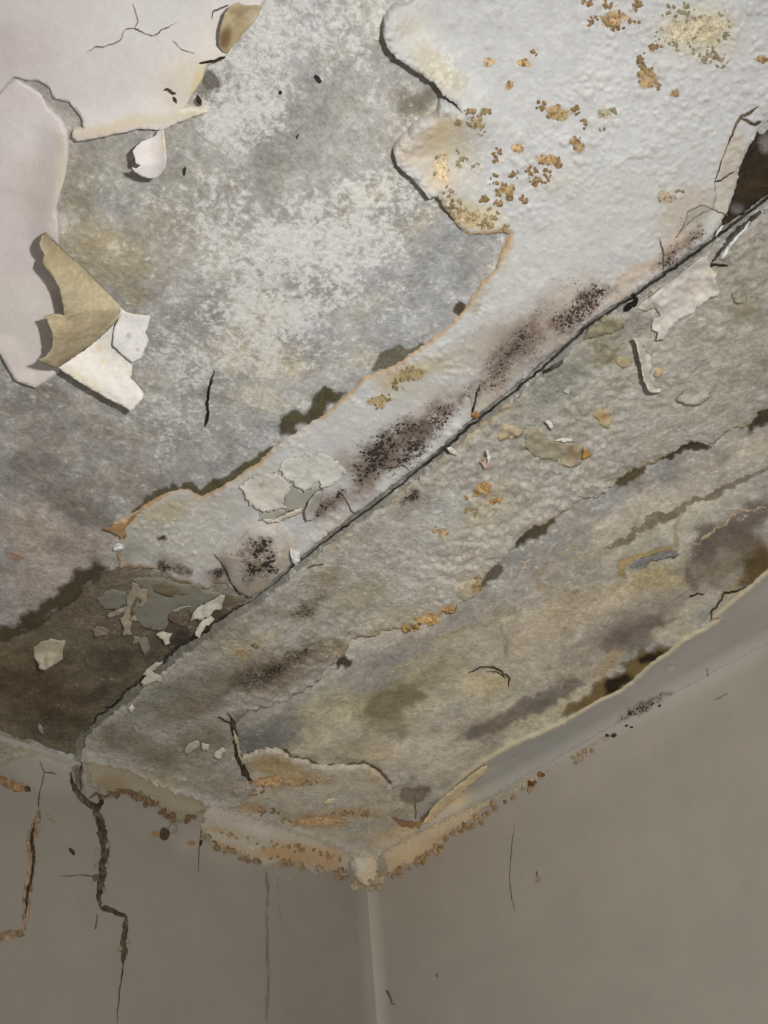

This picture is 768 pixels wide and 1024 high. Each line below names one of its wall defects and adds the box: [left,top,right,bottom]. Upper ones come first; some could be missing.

peeling [0,0,264,411]
corrosion [433,144,563,234]
corrosion [535,100,617,153]
corrosion [581,0,643,32]
corrosion [636,1,731,97]
peeling [80,0,768,861]
crack [83,106,768,733]
leakage [313,279,615,524]
crack [218,714,252,784]
leakage [0,559,541,892]
leakage [466,617,676,740]
crack [0,759,130,1023]